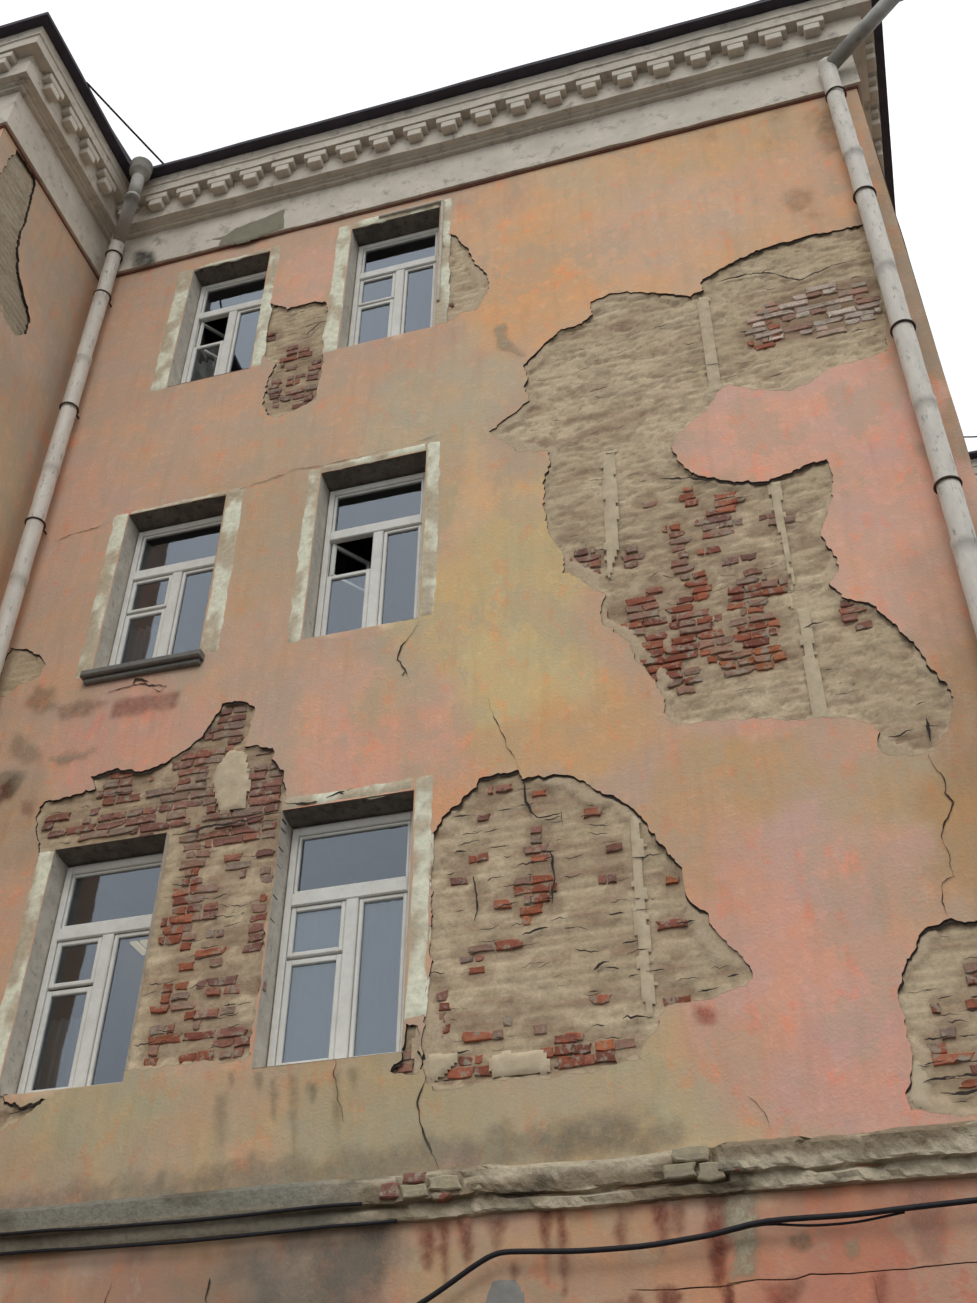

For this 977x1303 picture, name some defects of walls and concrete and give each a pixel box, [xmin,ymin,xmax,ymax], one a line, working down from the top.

flaking render [0,150,36,335]
flaking render [262,301,328,417]
flaking render [446,234,489,322]
flaking render [489,224,954,756]
crack [397,622,419,679]
flaking render [36,701,286,1082]
flaking render [390,770,753,1091]
crack [928,754,954,916]
flaking render [897,918,977,1117]
crack [416,1079,439,1170]
damp [726,1194,757,1275]